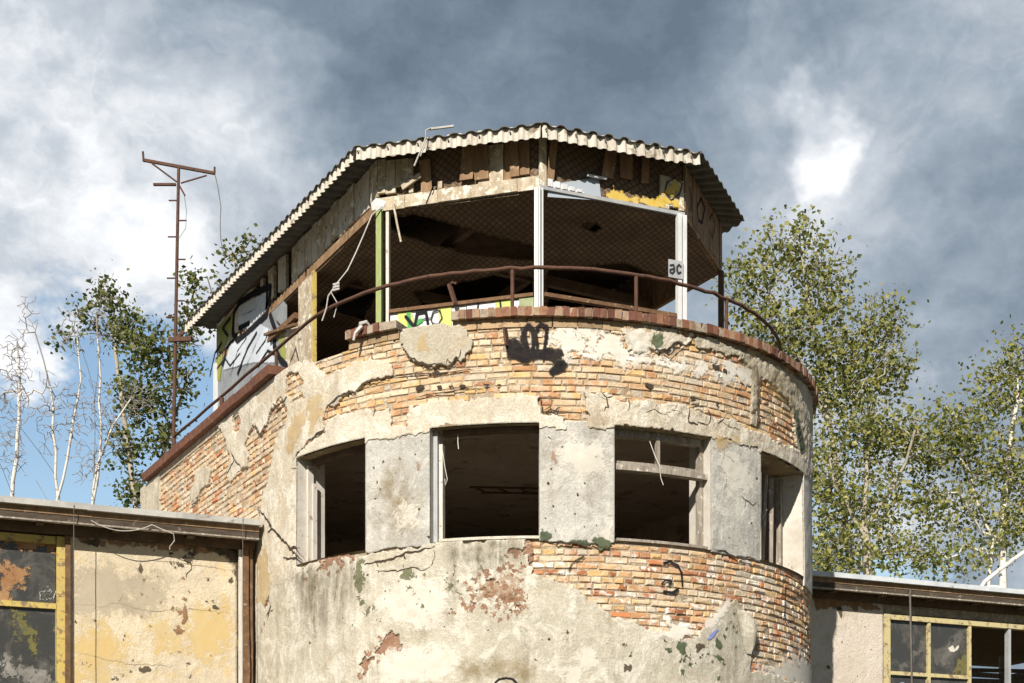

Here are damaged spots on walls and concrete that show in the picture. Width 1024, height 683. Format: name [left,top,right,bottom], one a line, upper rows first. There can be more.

crack [308,350,489,442]
spalling [304,327,805,455]
spalling [160,373,305,519]
peeling [0,534,56,607]
peeling [160,546,217,635]
crack [257,510,303,564]
crack [364,545,435,573]
spalling [440,518,880,683]
spalling [357,630,405,680]